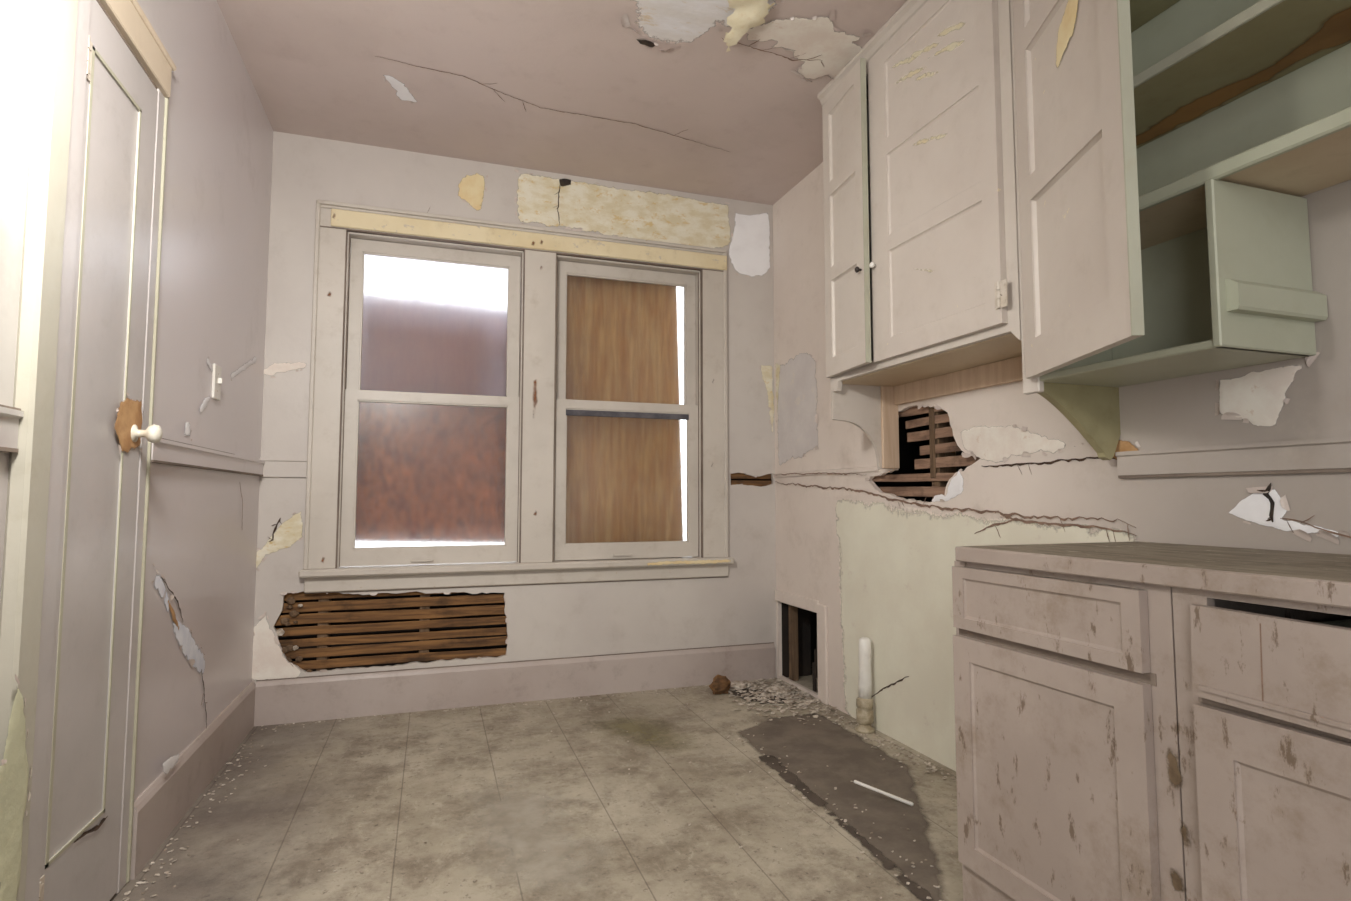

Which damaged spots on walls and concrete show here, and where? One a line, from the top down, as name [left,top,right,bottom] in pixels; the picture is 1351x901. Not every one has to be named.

peeling [621,0,871,82]
peeling [458,173,488,210]
peeling [515,169,770,277]
peeling [1215,352,1320,427]
crack [981,457,1115,474]
crack [775,472,1136,542]
spalling [1229,486,1349,545]
spalling [152,563,205,673]
spalling [252,591,508,683]
peeling [836,404,1134,771]